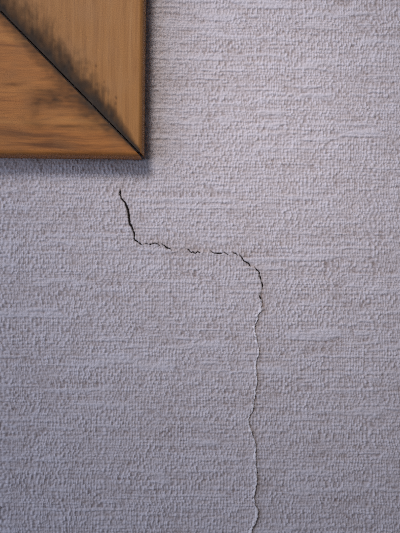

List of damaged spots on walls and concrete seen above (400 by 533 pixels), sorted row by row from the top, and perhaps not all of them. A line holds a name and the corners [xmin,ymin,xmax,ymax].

crack [119,190,171,250]
crack [187,249,263,533]